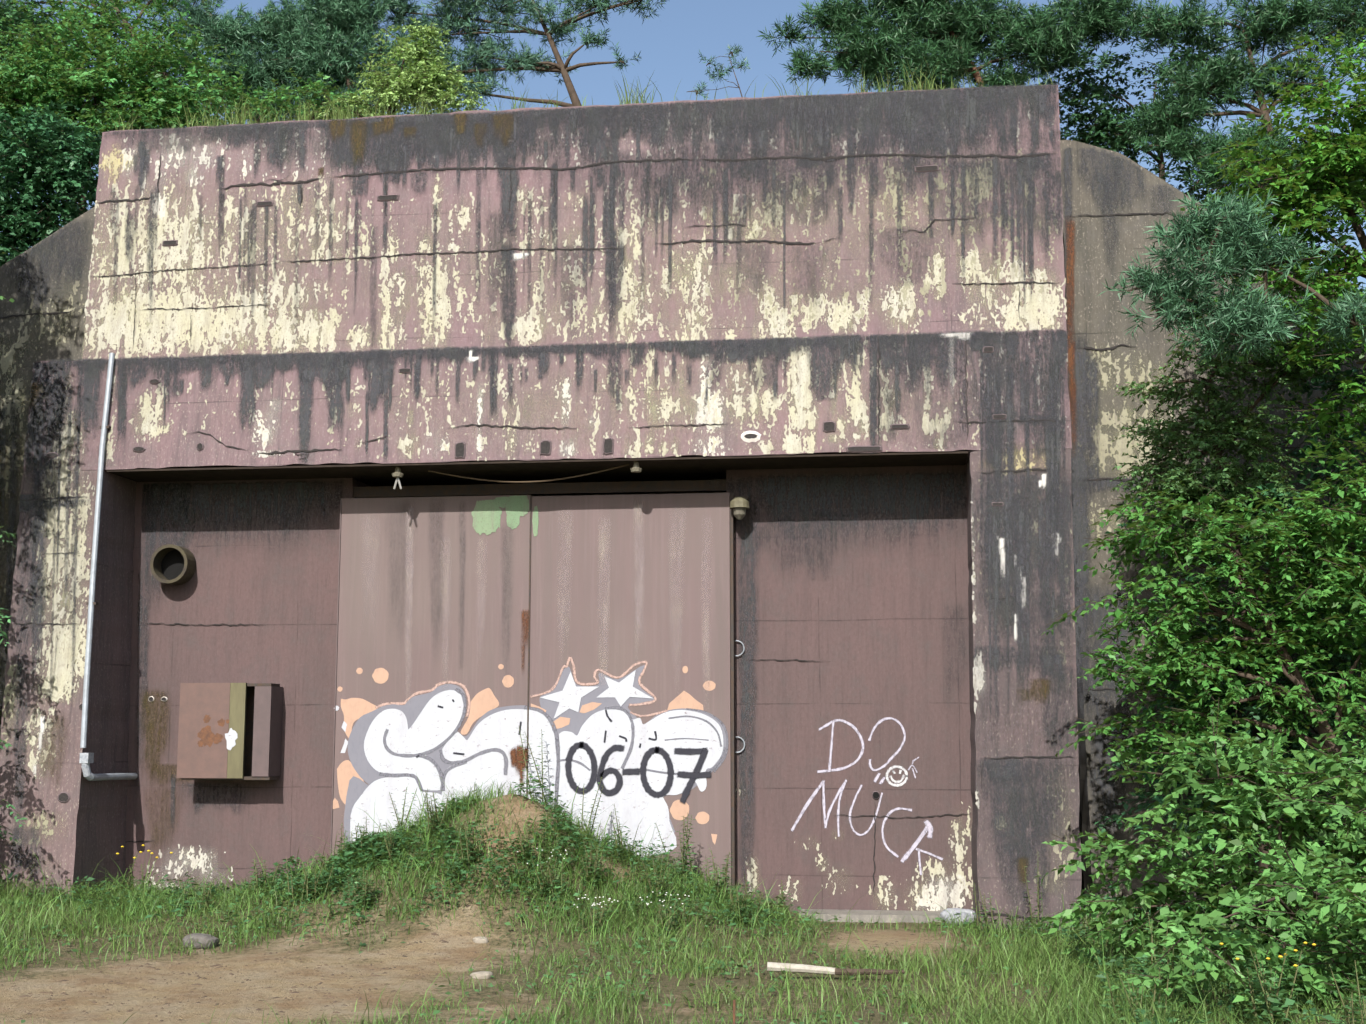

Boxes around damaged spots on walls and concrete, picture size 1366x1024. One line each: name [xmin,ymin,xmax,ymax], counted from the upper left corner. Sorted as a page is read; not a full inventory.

crack [91,151,161,205]
crack [222,148,1057,212]
crack [91,223,835,345]
crack [952,281,1060,320]
peeling [0,98,1187,783]
damp [0,84,1174,875]
rust [510,746,527,783]
peeling [130,844,234,888]
peeling [745,857,757,895]
peeling [778,876,799,902]
peeling [794,791,980,911]
damp [983,759,1061,901]